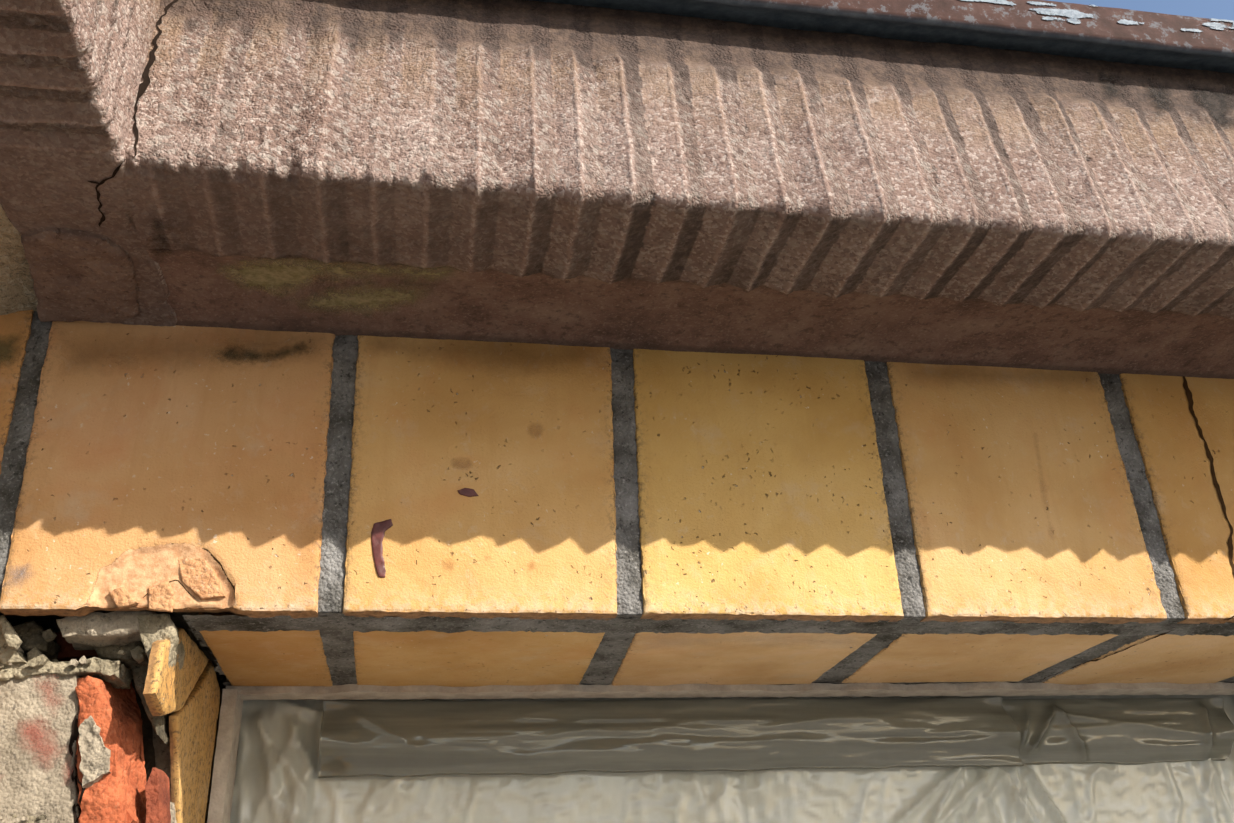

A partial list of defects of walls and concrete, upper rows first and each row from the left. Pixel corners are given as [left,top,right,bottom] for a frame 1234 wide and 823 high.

crack [88,0,178,227]
crack [1183,376,1234,575]
spalling [0,543,235,823]